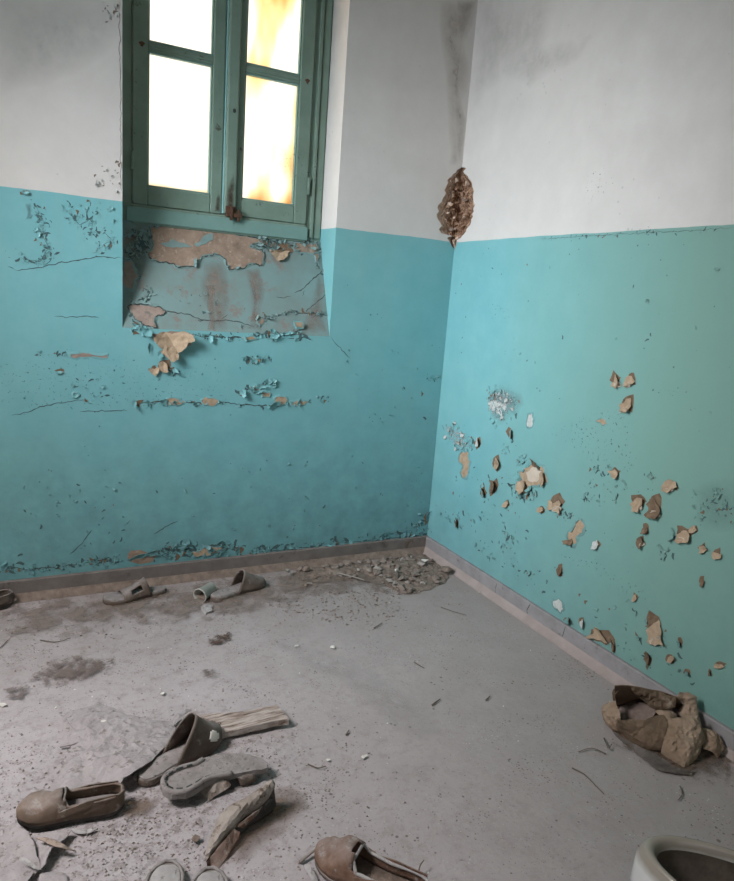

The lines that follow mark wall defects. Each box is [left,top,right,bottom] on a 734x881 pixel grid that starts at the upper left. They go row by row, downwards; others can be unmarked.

peeling [9,190,59,271]
crack [8,256,117,271]
peeling [61,199,328,386]
crack [168,311,254,327]
crack [278,271,327,317]
peeling [35,349,125,409]
crack [15,394,311,415]
peeling [0,370,695,685]
peeling [656,487,734,560]